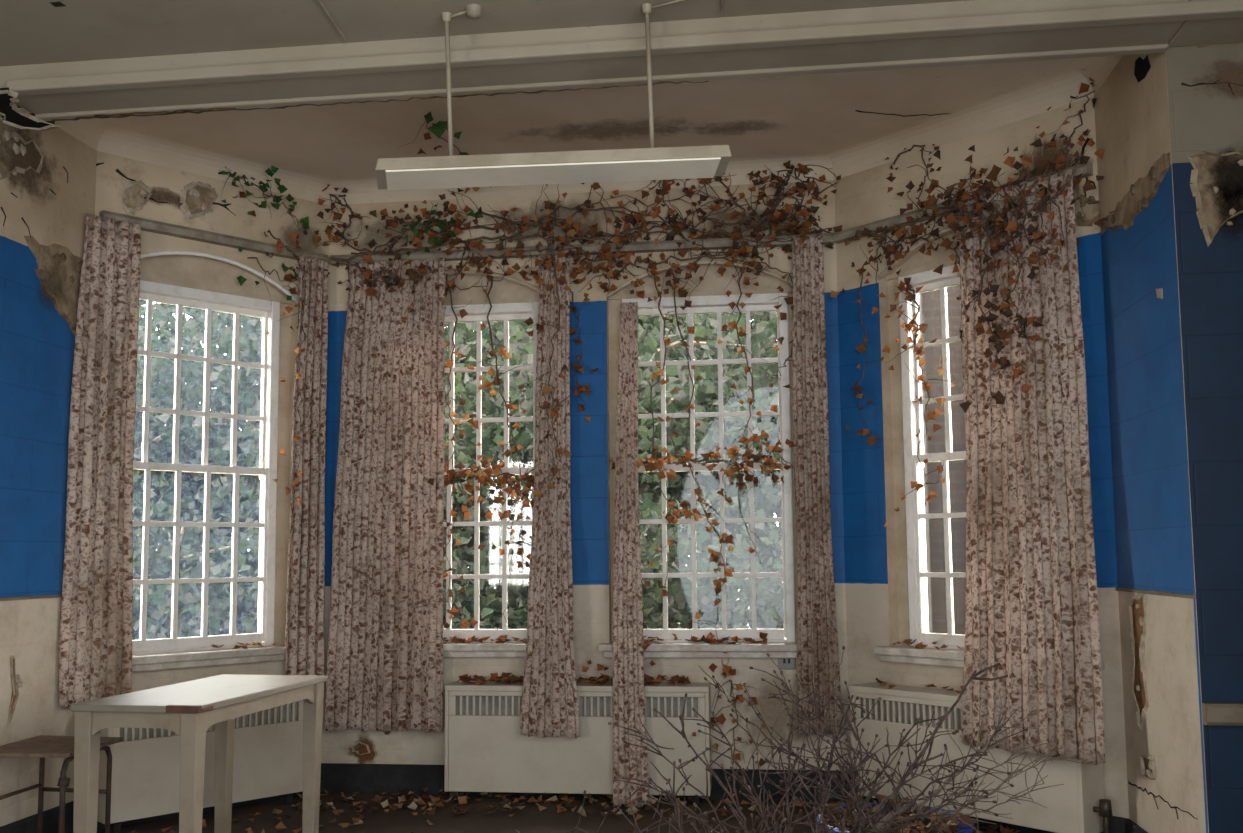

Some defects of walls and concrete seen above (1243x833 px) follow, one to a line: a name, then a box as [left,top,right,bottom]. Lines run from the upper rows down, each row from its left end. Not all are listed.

spalling [0,87,60,194]
peeling [180,181,218,220]
peeling [1074,152,1171,237]
spalling [1187,150,1243,247]
peeling [24,236,83,336]
peeling [7,655,23,727]